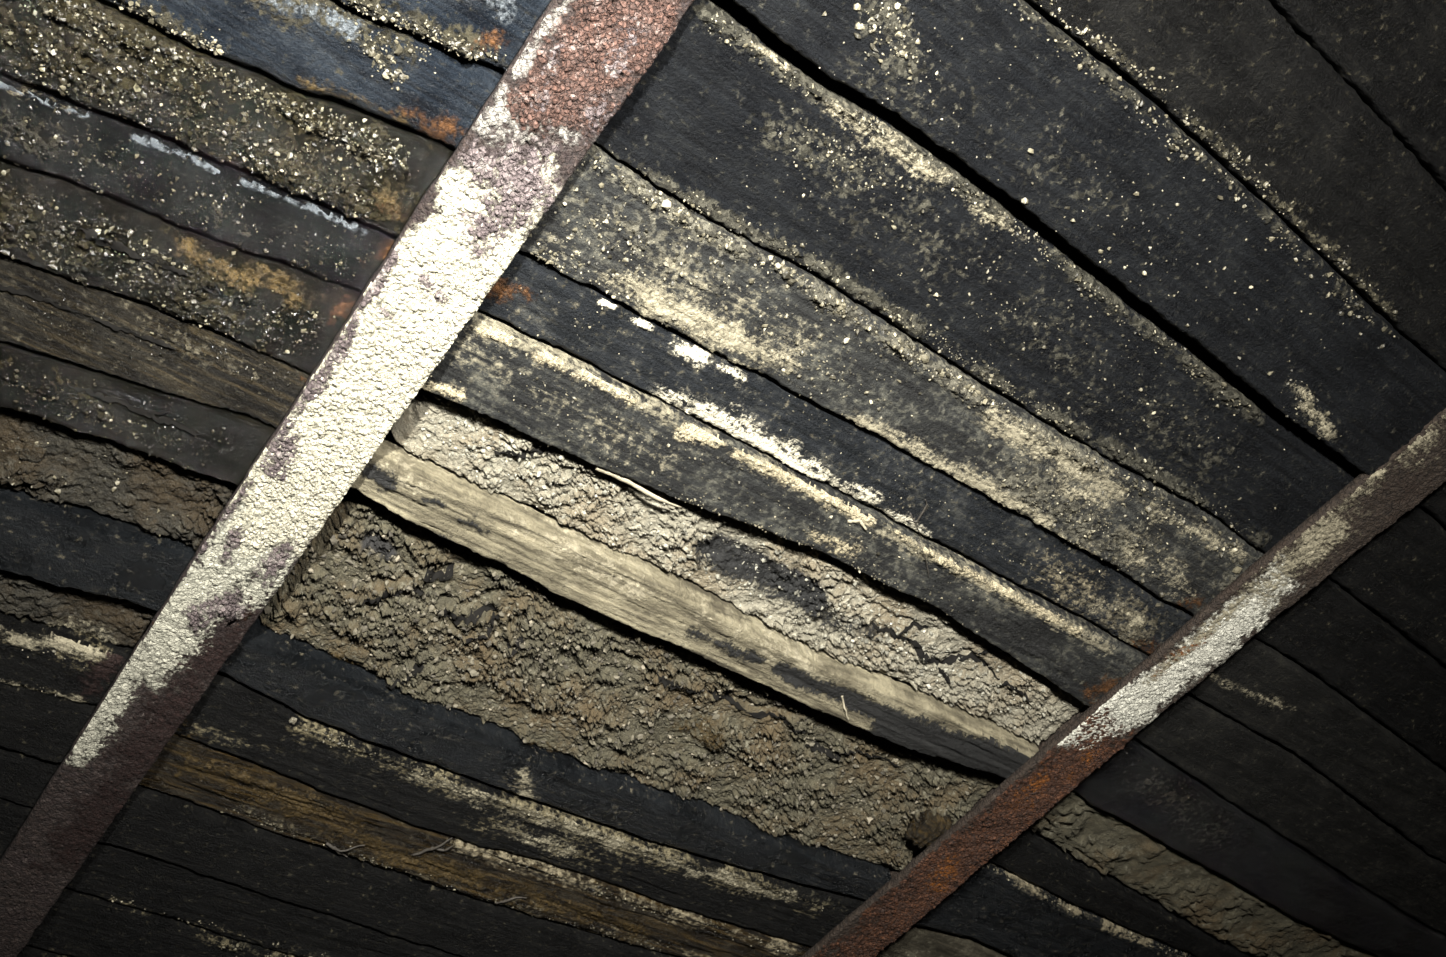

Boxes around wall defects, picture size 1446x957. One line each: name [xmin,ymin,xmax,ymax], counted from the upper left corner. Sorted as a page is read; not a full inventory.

damp [132,134,221,175]
corrosion [403,0,693,260]
damp [241,178,366,235]
damp [175,238,324,309]
corrosion [418,273,448,303]
damp [476,323,517,347]
damp [597,273,802,381]
corrosion [196,245,400,566]
damp [422,381,467,402]
damp [531,350,638,407]
damp [654,386,1145,645]
corrosion [812,675,1138,957]